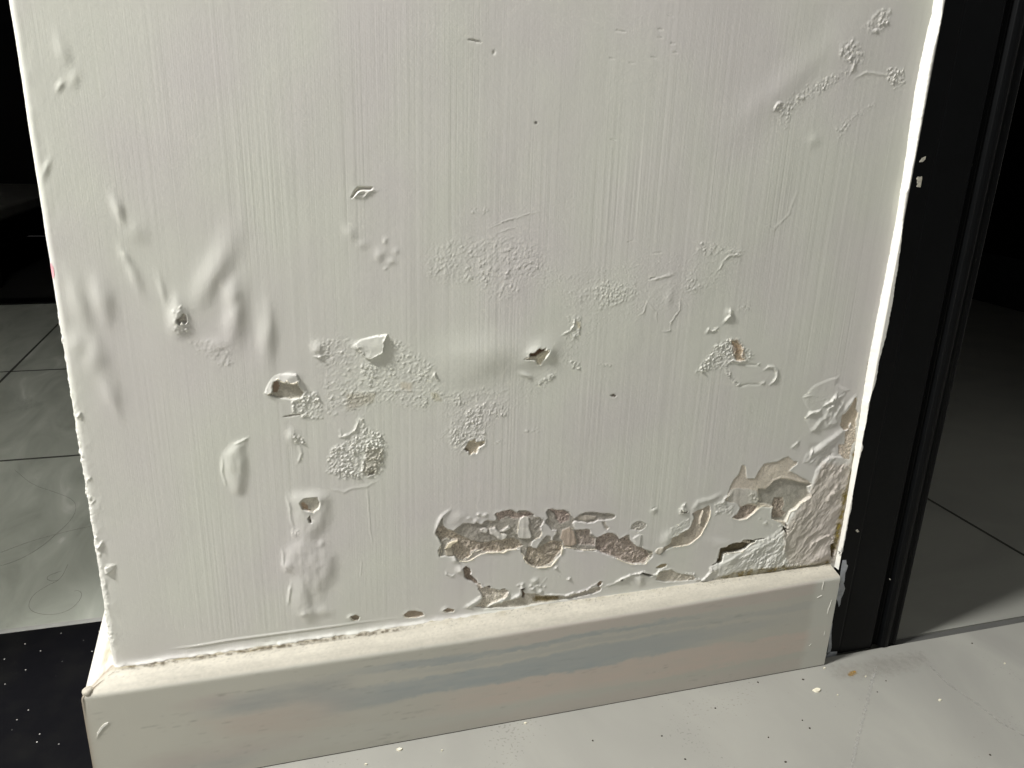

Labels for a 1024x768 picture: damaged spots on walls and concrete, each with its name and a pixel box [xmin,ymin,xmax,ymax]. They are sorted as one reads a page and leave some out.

peeling [348,183,380,201]
peeling [356,333,390,358]
peeling [520,343,557,386]
peeling [264,369,325,422]
peeling [725,454,812,526]
peeling [433,503,714,581]